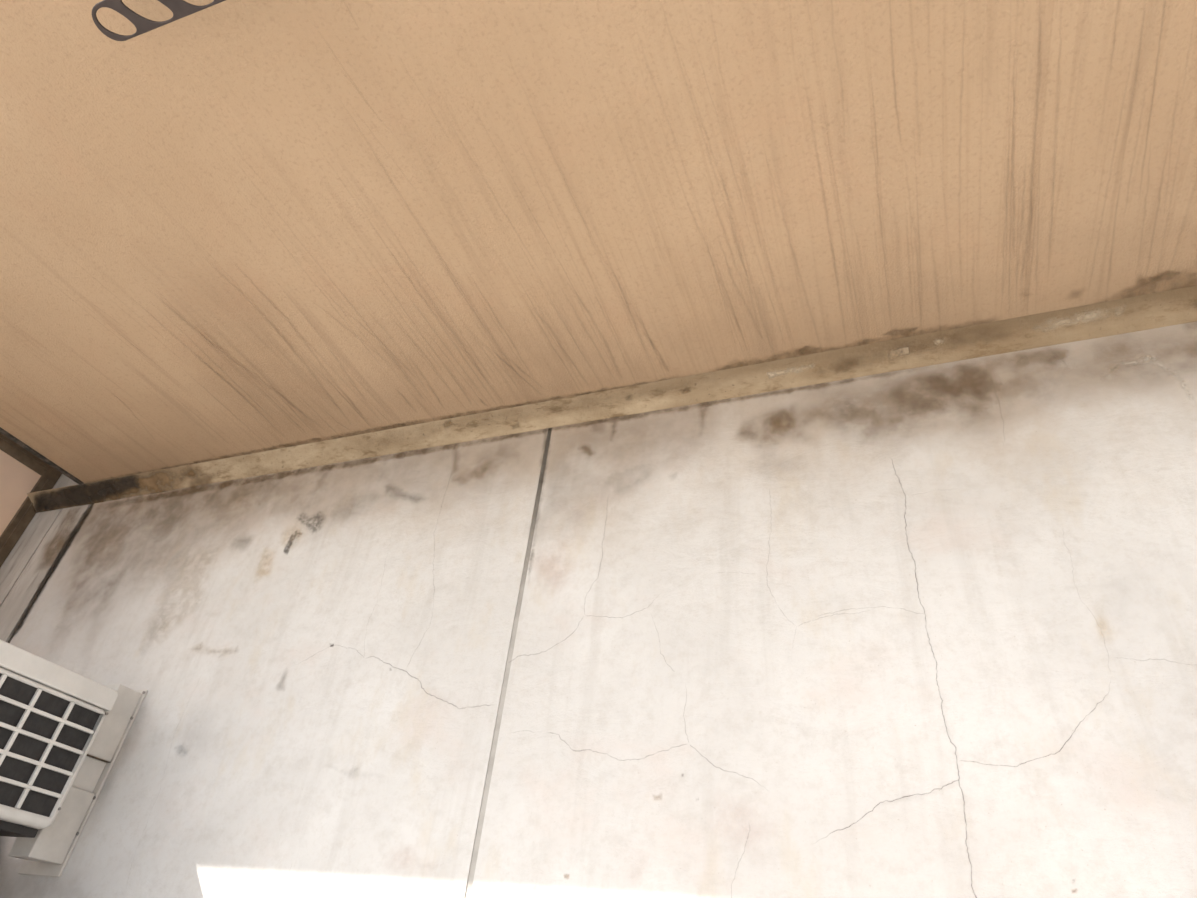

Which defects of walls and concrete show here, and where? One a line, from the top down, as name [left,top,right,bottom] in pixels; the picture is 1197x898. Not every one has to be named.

damp [12,510,91,633]
crack [834,476,1082,898]